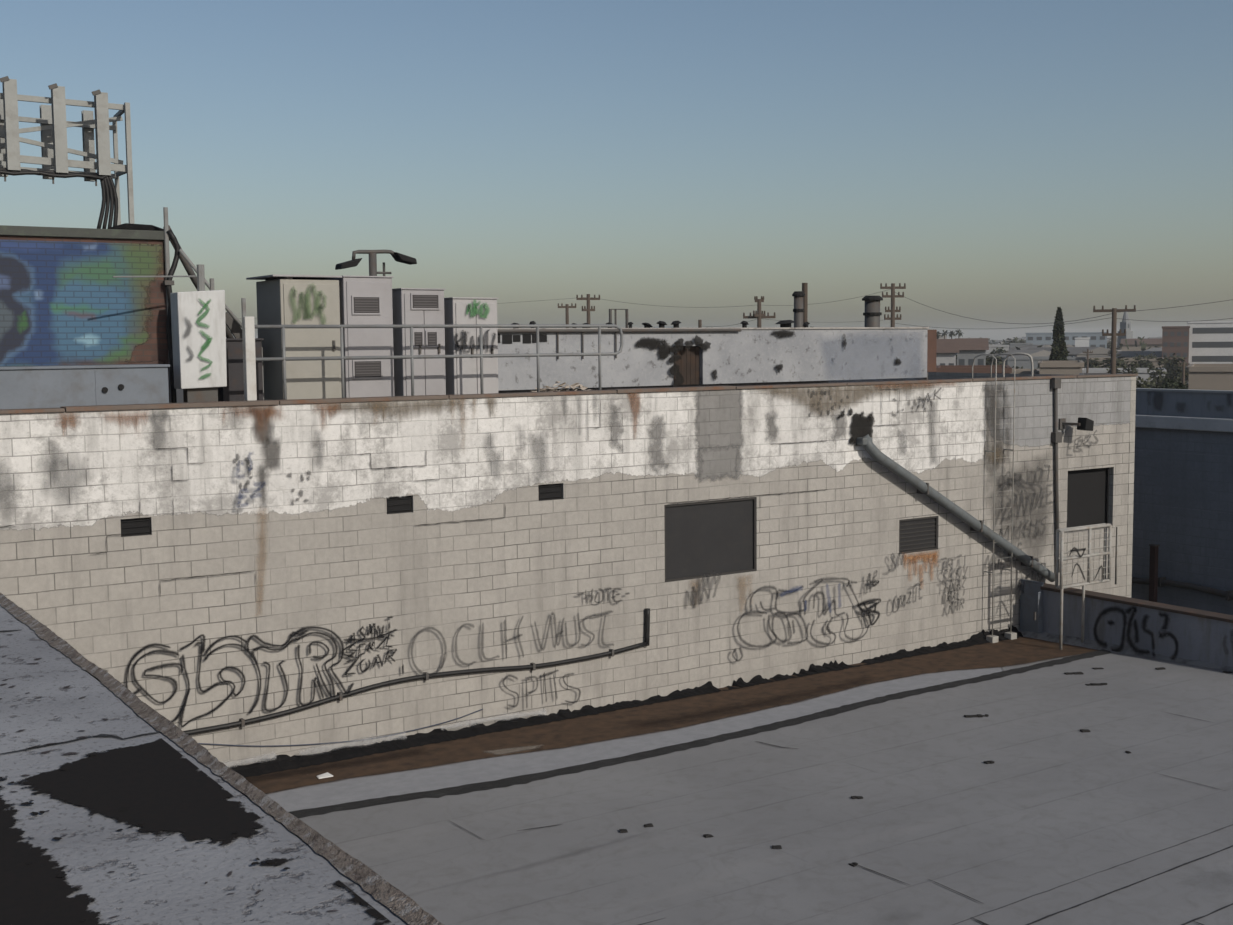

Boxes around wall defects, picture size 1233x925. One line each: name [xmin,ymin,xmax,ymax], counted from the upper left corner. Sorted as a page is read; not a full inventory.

spalling [669,335,711,387]
peeling [611,407,623,450]
peeling [649,418,666,469]
peeling [696,389,743,481]
peeling [767,416,778,439]
spalling [808,390,875,446]
peeling [0,730,268,925]